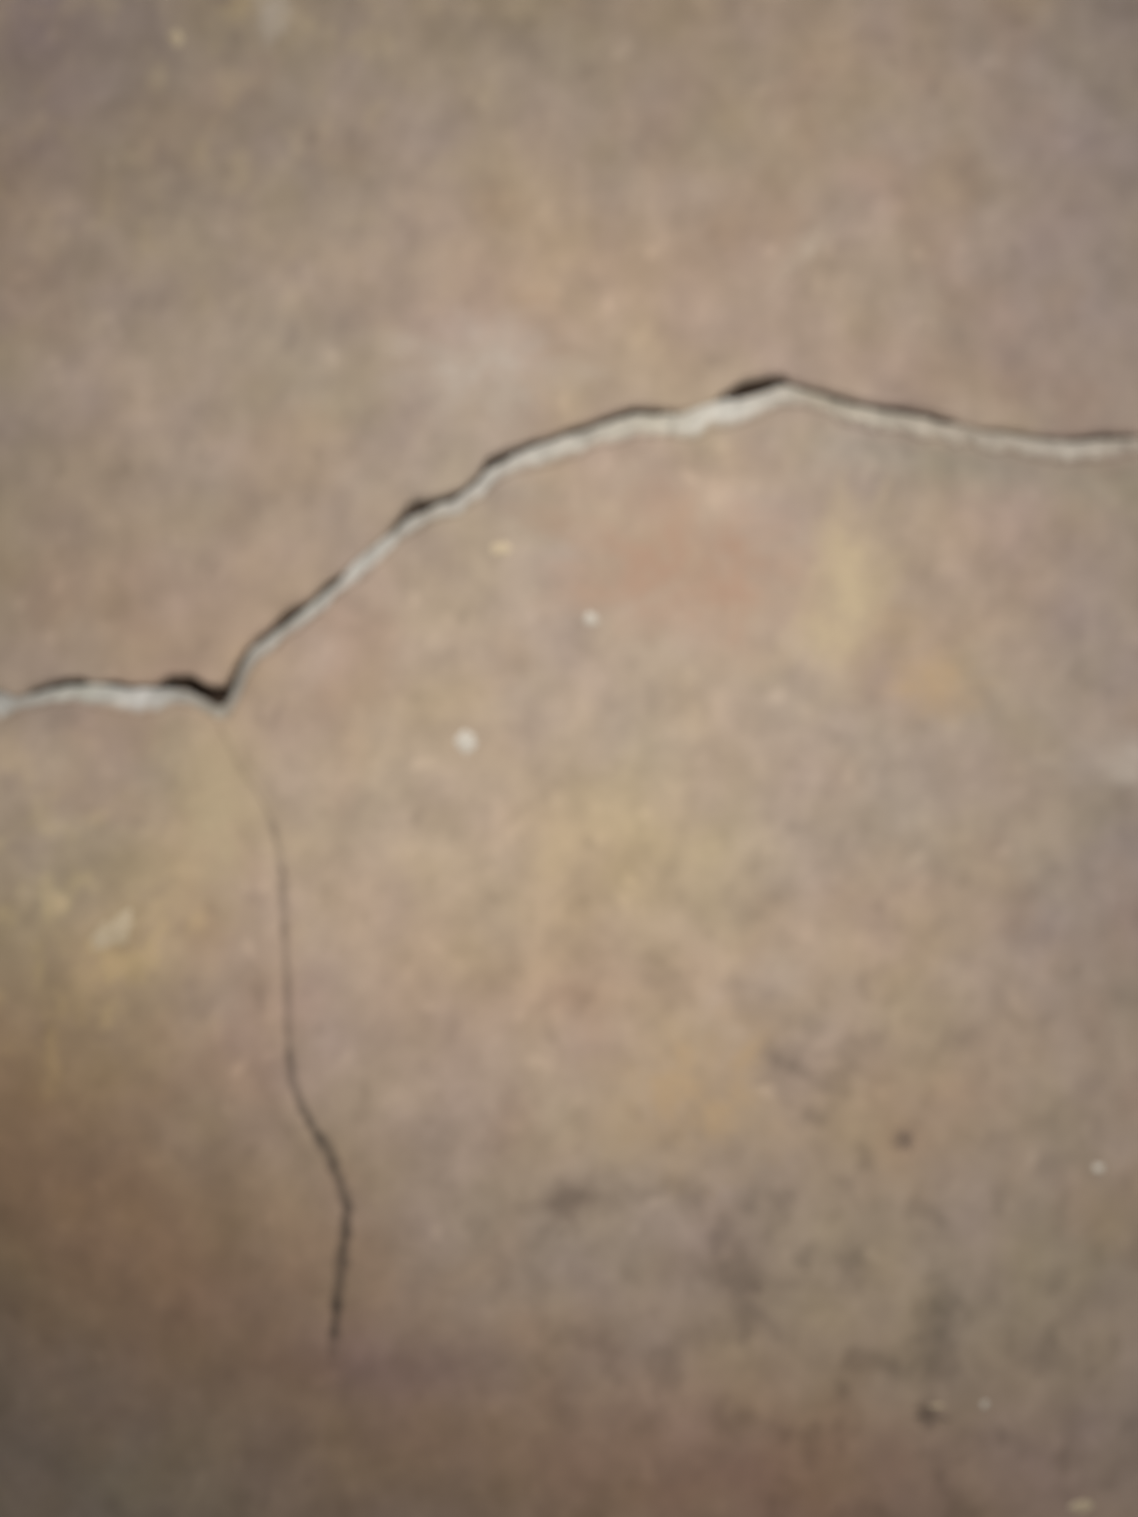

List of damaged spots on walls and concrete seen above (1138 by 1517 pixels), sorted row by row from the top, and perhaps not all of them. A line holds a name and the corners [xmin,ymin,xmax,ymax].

crack [0,376,1138,1368]